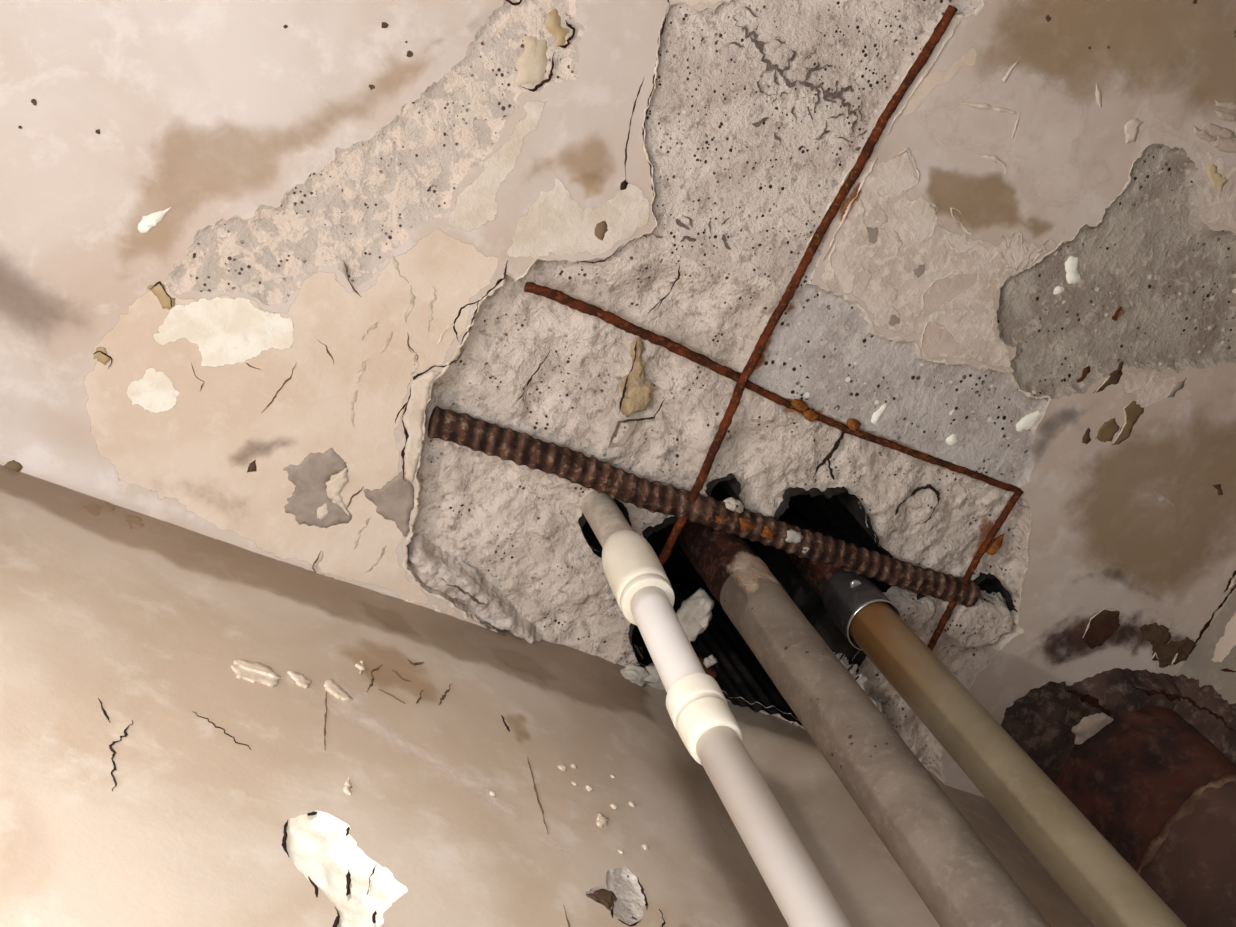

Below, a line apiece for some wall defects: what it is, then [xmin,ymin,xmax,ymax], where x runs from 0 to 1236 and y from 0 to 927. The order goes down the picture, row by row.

rust [841,183,861,220]
water stain [931,173,1012,218]
crack [395,263,507,486]
spalling [82,0,1236,690]
rust [784,399,822,422]
rust [846,418,861,431]
water stain [1044,617,1196,668]
crack [1186,570,1236,658]
crack [98,698,133,791]
spalling [852,651,945,784]
spalling [281,811,408,927]
spalling [586,866,666,927]